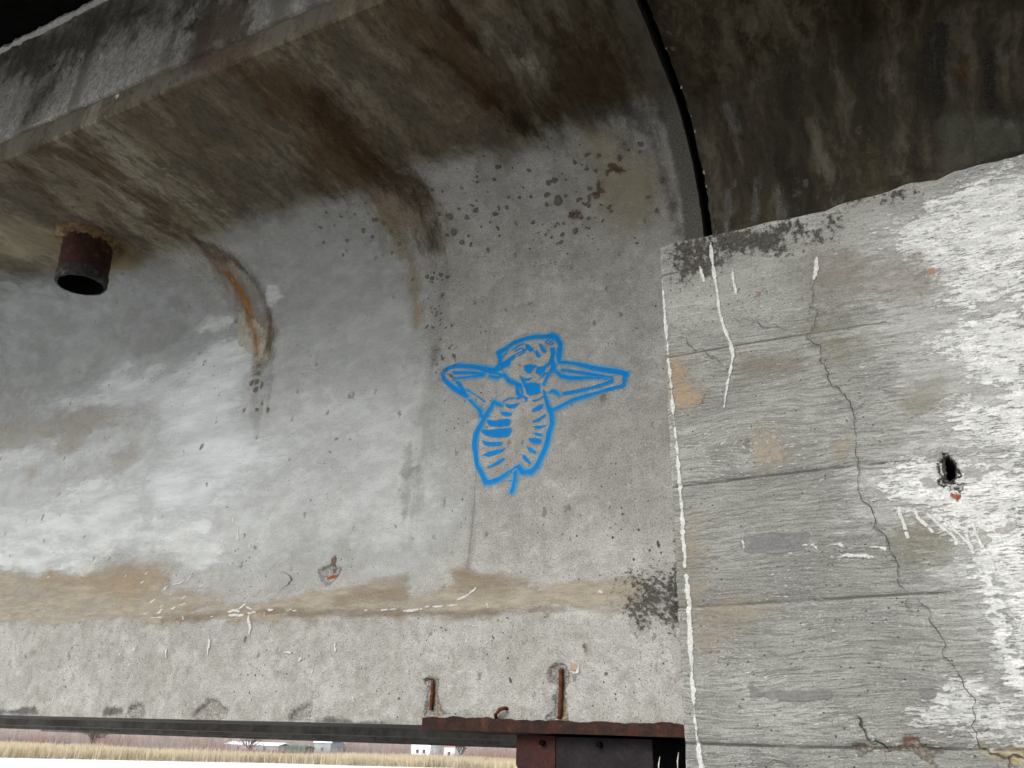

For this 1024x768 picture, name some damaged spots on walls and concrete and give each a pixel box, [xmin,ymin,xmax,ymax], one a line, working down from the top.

corrosion [190,237,272,362]
peeling [830,155,1024,767]
spalling [318,556,341,586]
leakage [610,529,681,646]
peeling [740,532,818,554]
crack [727,279,1024,768]
peeling [748,684,832,701]